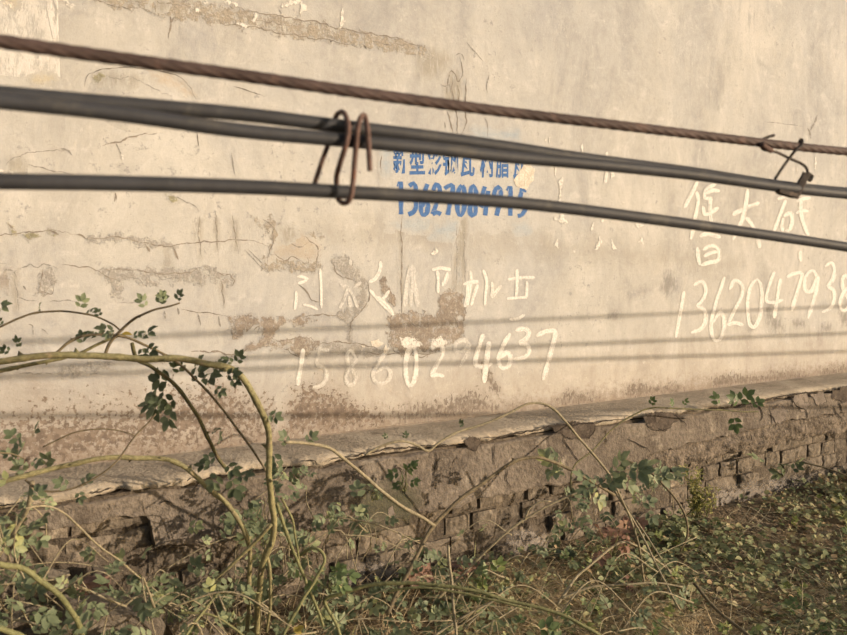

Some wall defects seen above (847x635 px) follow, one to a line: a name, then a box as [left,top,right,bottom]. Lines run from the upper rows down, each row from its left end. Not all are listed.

peeling [0,0,434,60]
peeling [0,49,60,78]
crack [4,148,72,174]
crack [103,133,157,160]
peeling [62,213,468,361]
damp [0,354,531,475]